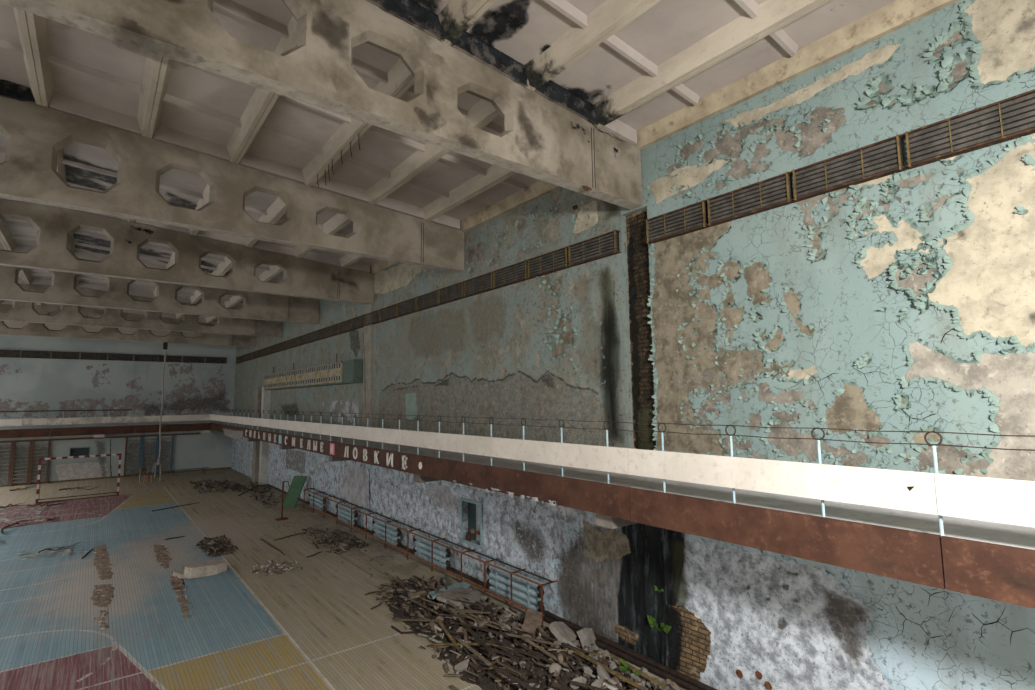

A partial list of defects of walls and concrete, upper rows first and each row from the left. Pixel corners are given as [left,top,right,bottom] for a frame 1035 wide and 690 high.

damp [371,0,623,126]
peeling [647,0,1035,204]
peeling [0,362,231,419]
damp [378,271,620,446]
peeling [647,133,1035,481]
peeling [55,462,110,480]
peeling [667,538,892,690]
crack [892,587,1033,655]